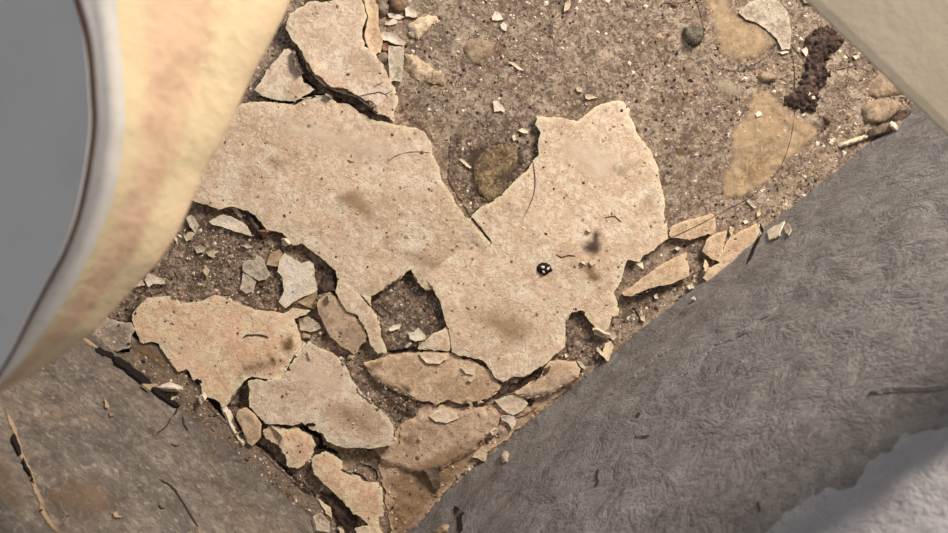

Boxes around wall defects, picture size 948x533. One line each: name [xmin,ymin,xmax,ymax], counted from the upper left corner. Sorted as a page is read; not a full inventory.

peeling [738,0,808,56]
crack [259,94,325,105]
spalling [448,101,539,213]
crack [4,408,59,533]
crack [83,338,188,435]
spalling [108,211,336,359]
spalling [221,379,250,446]
crack [186,371,317,496]
spalling [337,353,459,423]
spalling [373,271,447,364]
peeling [466,394,528,435]
spalling [564,310,617,370]